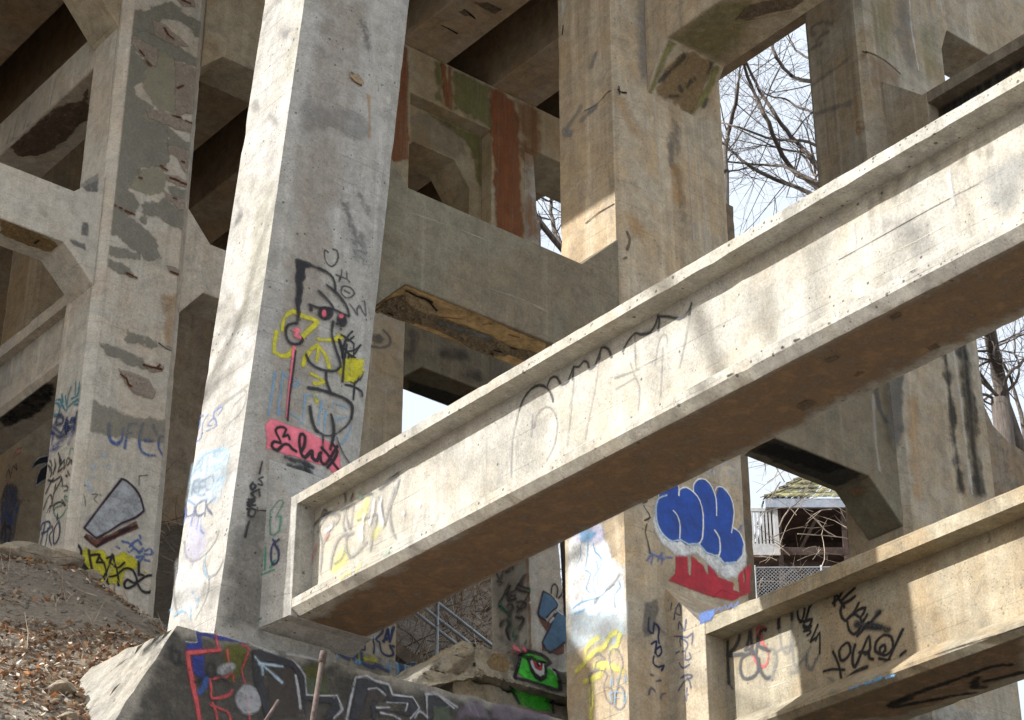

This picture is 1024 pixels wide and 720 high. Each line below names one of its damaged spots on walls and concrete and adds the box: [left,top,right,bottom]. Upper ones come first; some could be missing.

peeling [108,0,200,279]
corrosion [391,47,409,162]
corrosion [490,89,539,238]
spalling [657,53,713,112]
peeling [91,401,165,442]
spalling [101,333,172,399]
spalling [375,285,546,366]
damp [313,244,1024,636]